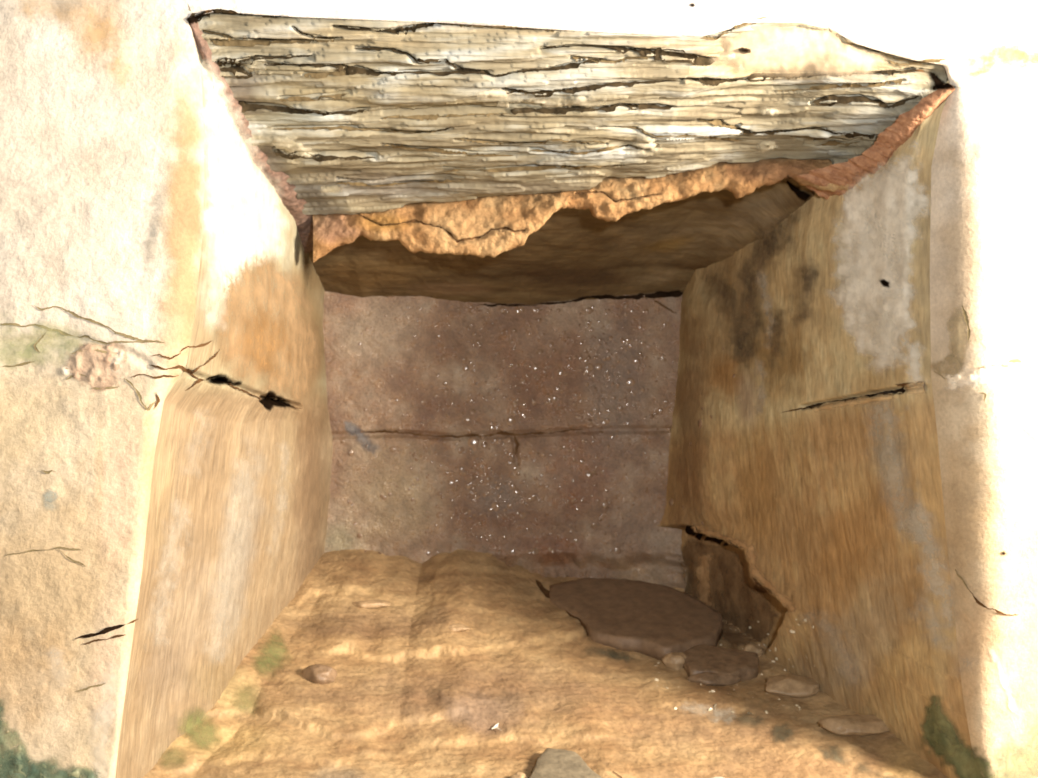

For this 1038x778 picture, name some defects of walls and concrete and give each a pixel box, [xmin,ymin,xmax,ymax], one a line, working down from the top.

crack [829,28,945,72]
crack [1,306,302,411]
crack [784,381,926,412]
spalling [680,525,795,648]
crack [955,569,1018,616]
crack [76,619,138,645]